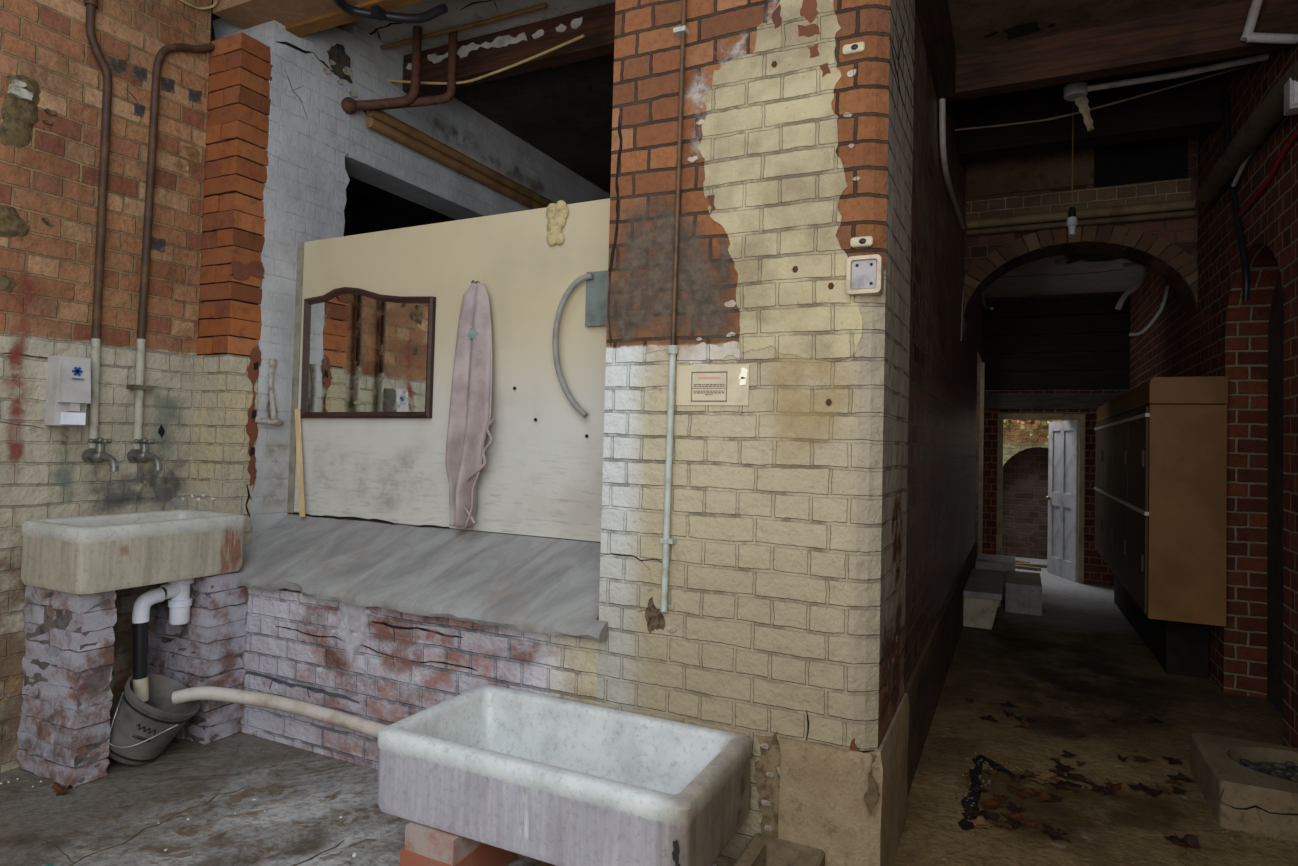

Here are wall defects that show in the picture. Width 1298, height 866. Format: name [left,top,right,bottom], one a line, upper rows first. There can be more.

peeling [428,17,583,64]
peeling [646,0,863,365]
damp [10,346,23,415]
spalling [246,346,261,486]
crack [44,787,246,866]
crack [292,839,345,866]
spalling [753,732,781,837]
peeling [849,738,880,815]
crack [1219,789,1298,823]